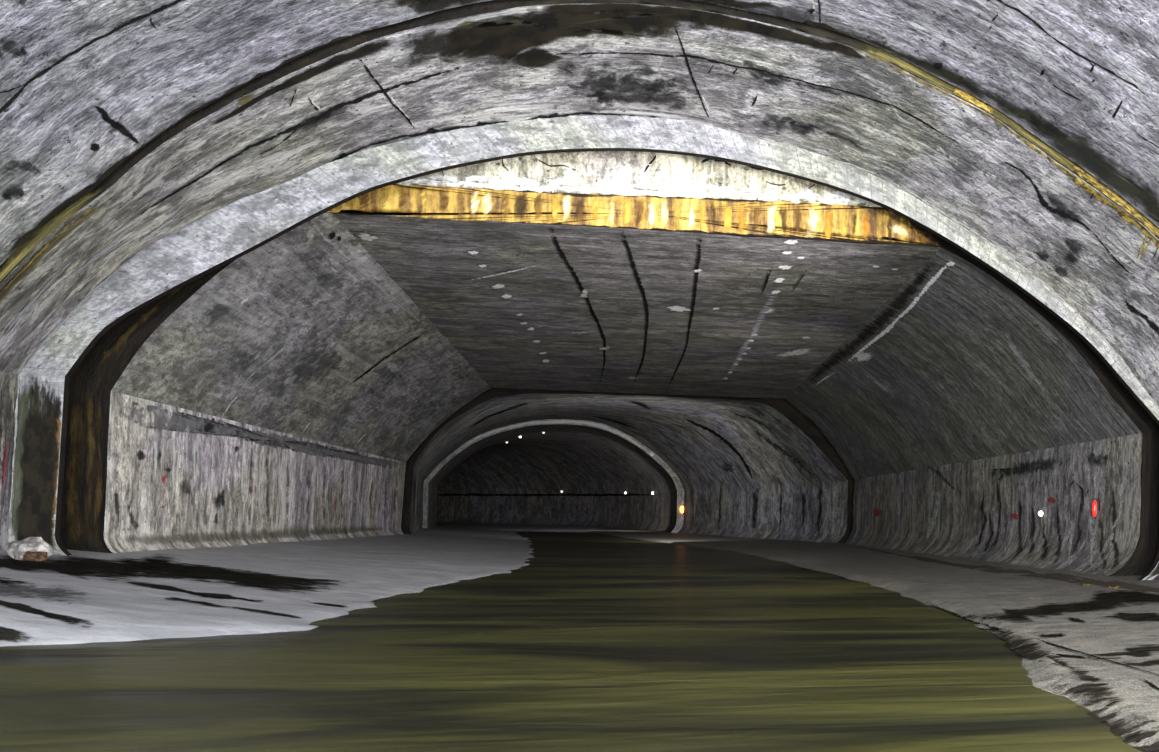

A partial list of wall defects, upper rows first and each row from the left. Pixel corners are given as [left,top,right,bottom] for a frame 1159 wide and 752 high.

crack [0,0,185,113]
leakage [510,190,686,199]
leakage [561,61,685,111]
rust [326,185,937,246]
leakage [690,0,1159,223]
rust [858,41,1159,262]
crack [551,227,606,381]
crack [593,232,650,429]
crack [668,239,702,385]
leakage [779,336,812,357]
crack [685,418,753,479]
crack [1035,633,1159,690]